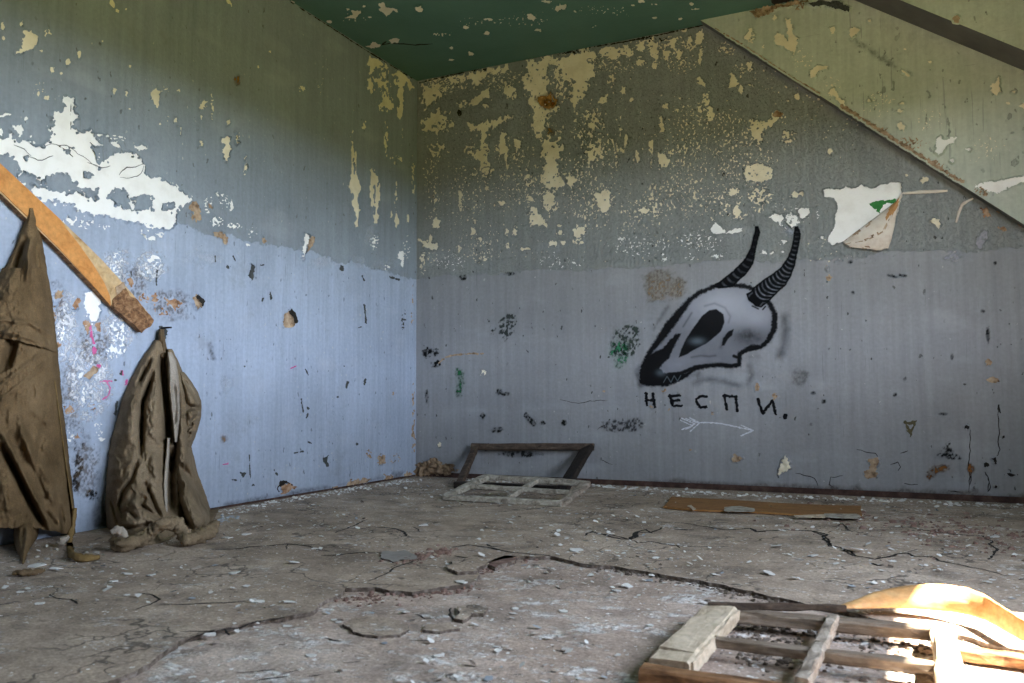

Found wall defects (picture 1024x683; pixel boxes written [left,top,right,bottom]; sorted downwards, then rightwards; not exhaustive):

peeling [325,1,399,24]
corrosion [536,92,558,109]
peeling [347,0,1024,283]
peeling [0,84,268,339]
spalling [281,309,298,329]
spalling [224,382,724,604]
crack [216,519,550,581]
crack [585,522,1006,576]
peeling [759,493,1024,604]
crack [134,593,306,642]
crack [416,608,454,642]
crack [238,644,322,681]